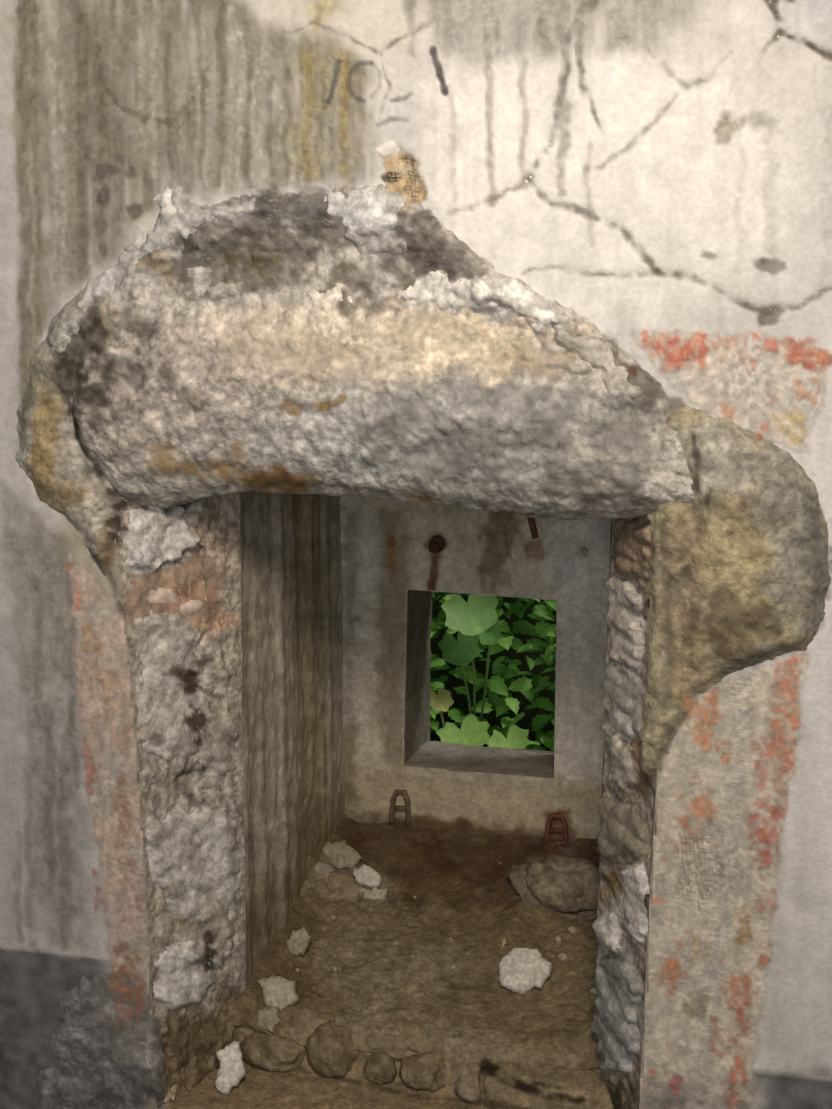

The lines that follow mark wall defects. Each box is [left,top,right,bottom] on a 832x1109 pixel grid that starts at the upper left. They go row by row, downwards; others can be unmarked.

leakage [430,0,500,53]
leakage [517,0,558,45]
leakage [606,0,656,47]
crack [765,0,832,60]
crack [558,35,597,119]
leakage [16,0,487,434]
crack [566,205,598,219]
crack [623,230,681,276]
crack [741,303,781,313]
peeling [634,313,830,452]
rust [428,542,447,591]
peeling [590,518,808,1109]